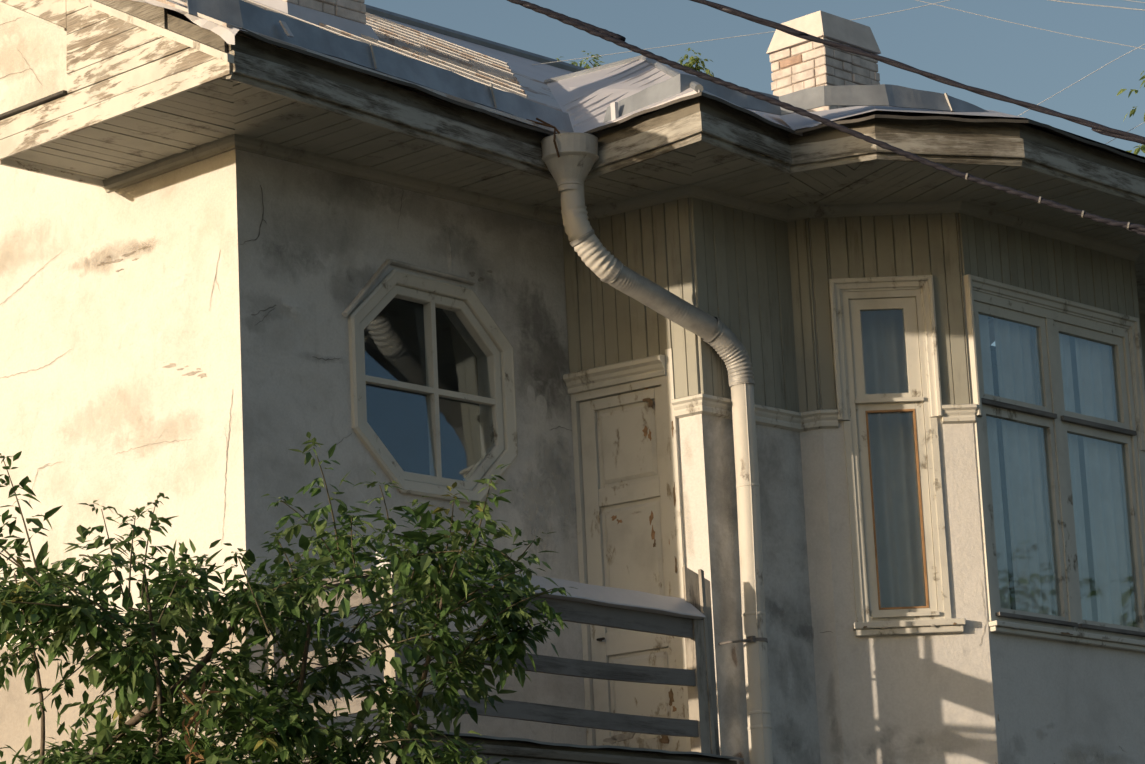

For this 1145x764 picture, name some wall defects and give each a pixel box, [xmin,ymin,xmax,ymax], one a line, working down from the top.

crack [0,50,42,85]
flaking render [97,246,151,272]
crack [210,185,267,301]
crack [221,389,233,546]